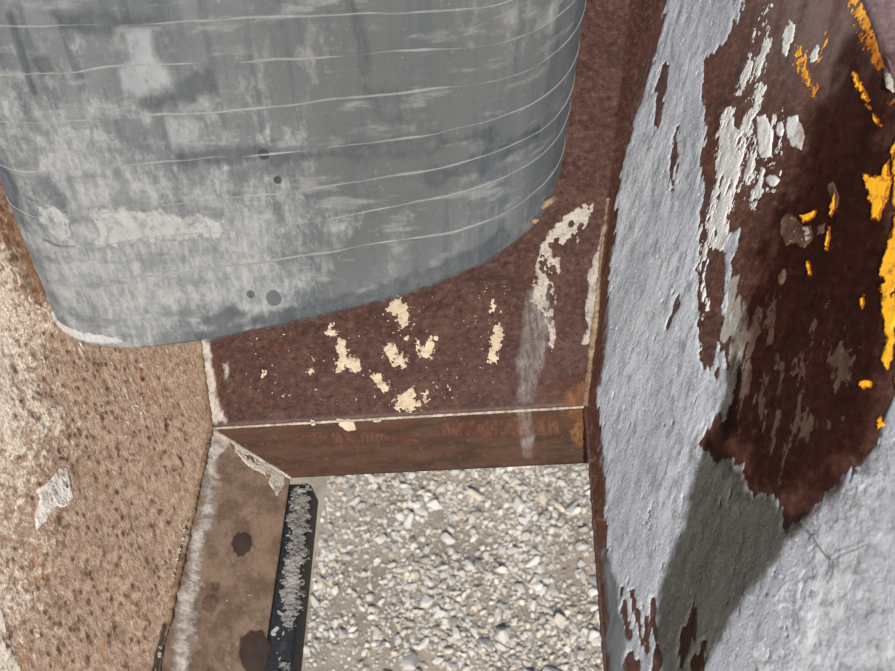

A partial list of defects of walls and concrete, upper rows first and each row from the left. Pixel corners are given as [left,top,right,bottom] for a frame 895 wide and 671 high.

rust [792,31,828,97]
peeling [698,3,805,371]
peeling [862,143,895,382]
rust [213,355,233,400]
peeling [324,322,431,413]
peeling [383,295,439,369]
peeling [487,322,505,364]
rust [441,180,617,506]
rust [296,431,427,445]
water stain [231,532,252,557]
water stain [239,630,272,671]
spalling [620,587,660,671]